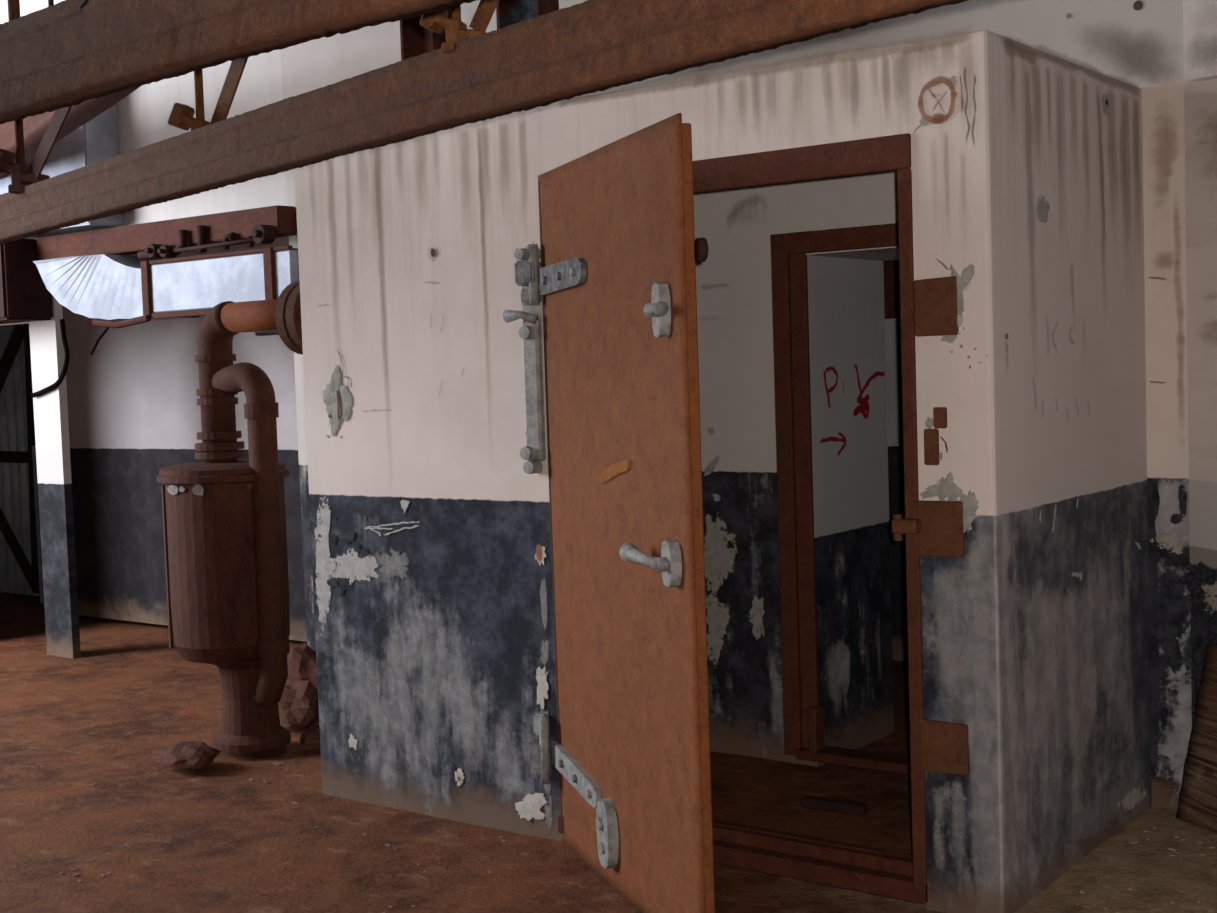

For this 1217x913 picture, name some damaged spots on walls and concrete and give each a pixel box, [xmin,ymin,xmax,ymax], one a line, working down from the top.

rust [914,76,956,133]
spalling [322,351,352,439]
spalling [920,472,979,533]
peeling [1149,483,1187,554]
peeling [314,496,408,636]
peeling [704,494,739,665]
peeling [749,596,765,640]
peeling [1149,569,1217,682]
peeling [769,659,783,733]
peeling [997,524,1023,870]